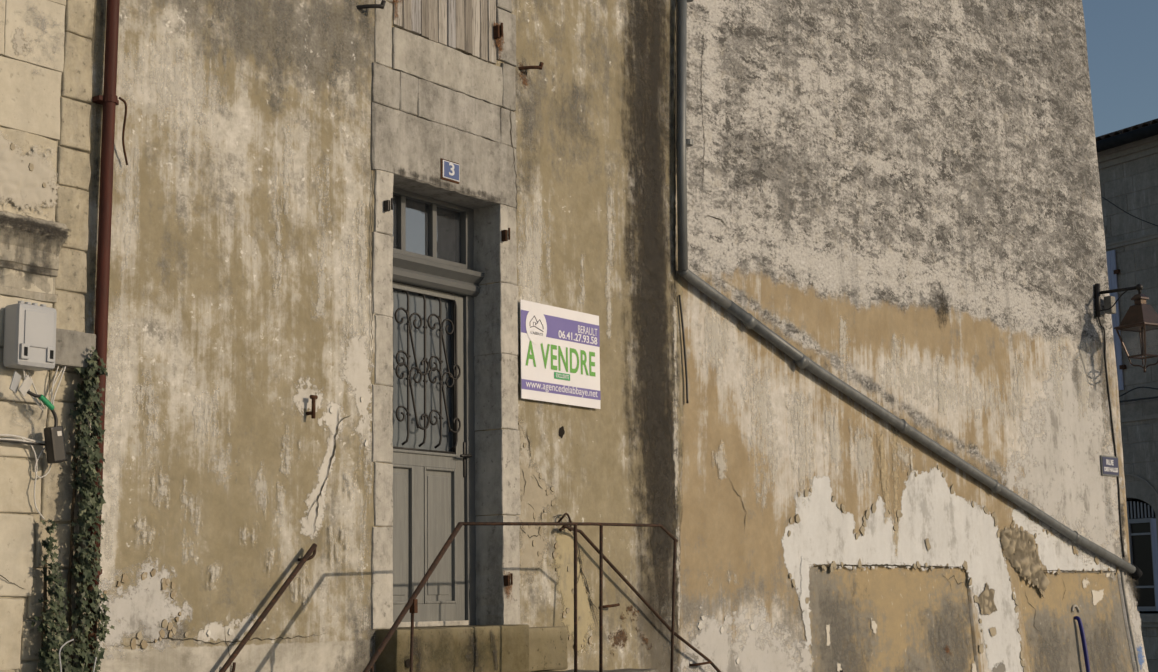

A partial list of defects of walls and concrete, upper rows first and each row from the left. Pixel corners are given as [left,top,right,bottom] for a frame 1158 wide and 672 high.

leakage [313,157,332,320]
leakage [342,203,367,336]
leakage [515,71,551,303]
leakage [605,0,874,672]
leakage [937,291,949,323]
flaking render [255,425,301,527]
crack [307,414,351,535]
leakage [880,335,1138,606]
flaking render [97,560,258,659]
flaking render [291,570,312,608]
flaking render [781,429,1120,672]